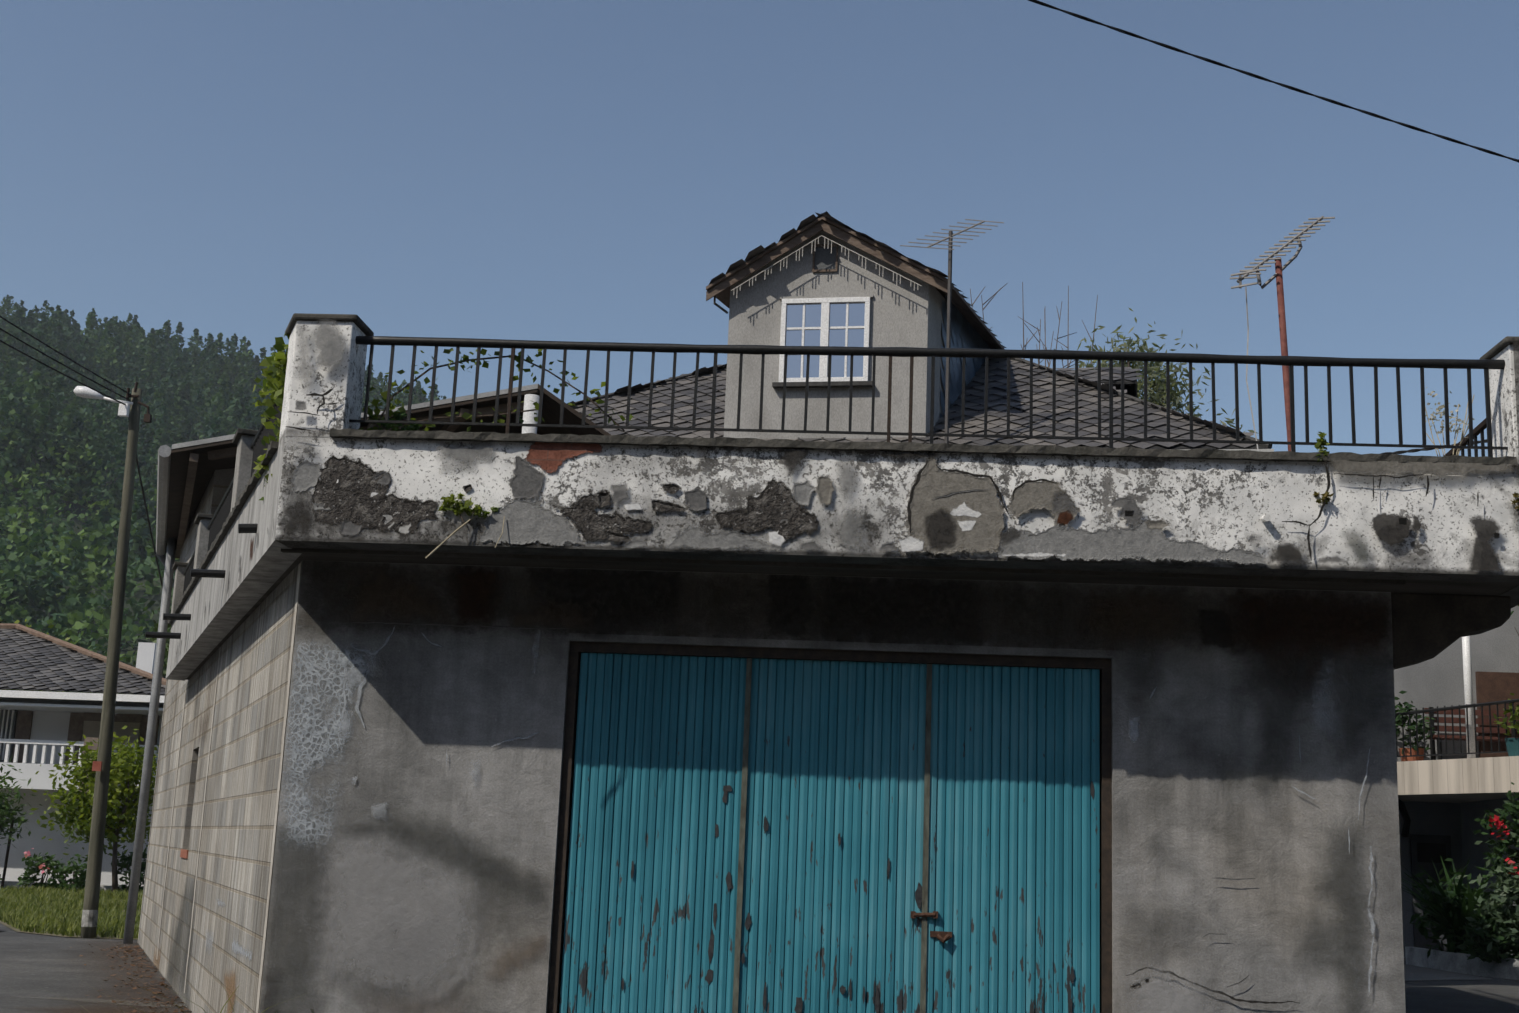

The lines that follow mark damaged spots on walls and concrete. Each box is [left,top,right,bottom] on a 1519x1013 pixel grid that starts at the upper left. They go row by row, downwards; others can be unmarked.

peeling [296,321,345,410]
spalling [286,436,440,536]
water stain [282,465,486,542]
peeling [439,441,493,462]
water stain [626,513,656,548]
spalling [508,442,855,546]
water stain [668,524,781,551]
water stain [880,542,898,551]
spalling [899,458,1265,564]
water stain [487,569,1388,649]
crack [1126,967,1298,1004]